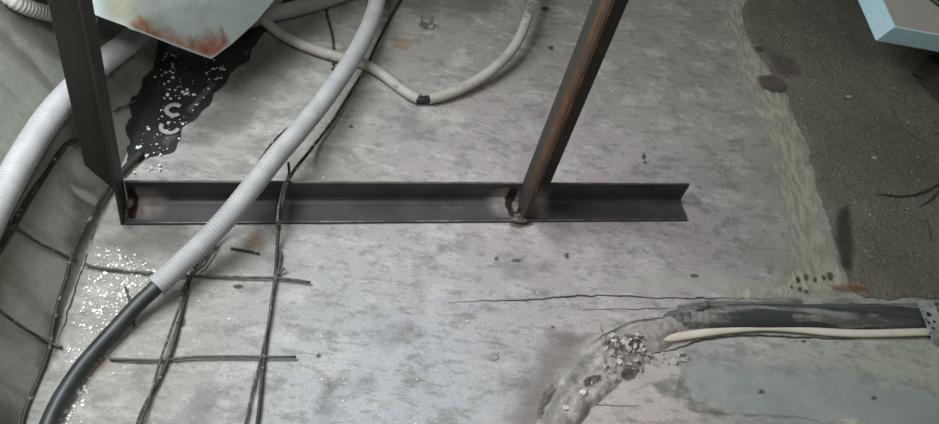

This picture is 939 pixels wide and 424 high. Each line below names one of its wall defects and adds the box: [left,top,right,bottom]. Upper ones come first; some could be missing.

crack [450,295,796,344]
spalling [578,332,690,395]
crack [655,334,851,353]